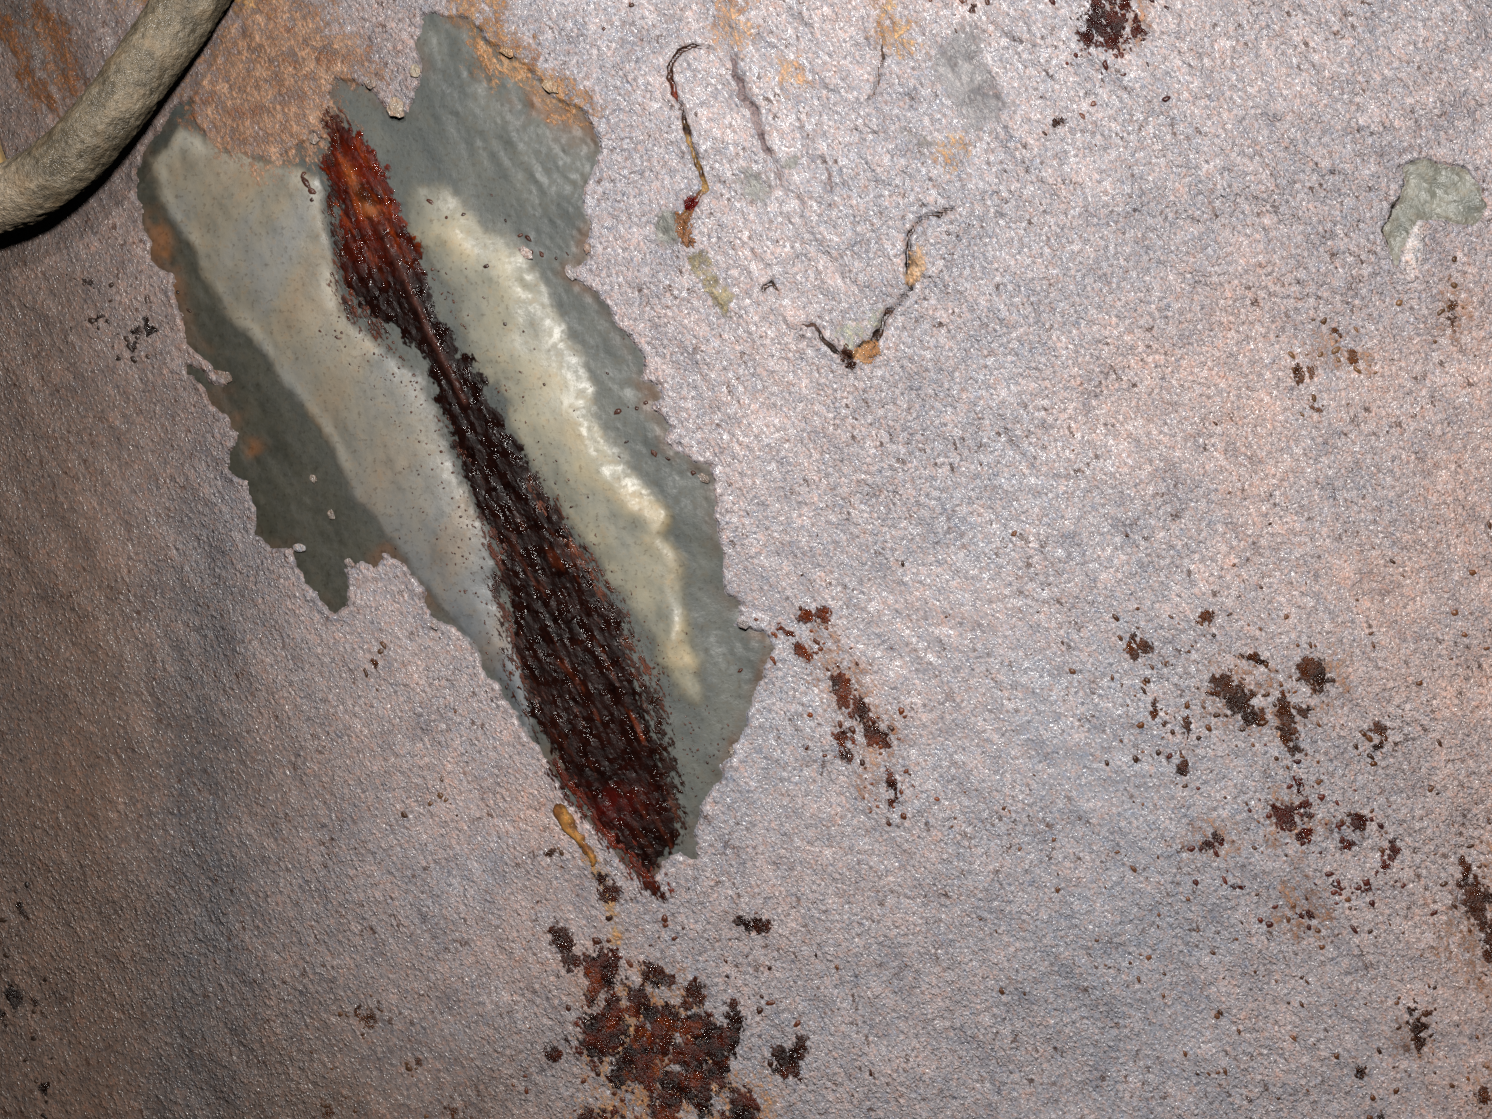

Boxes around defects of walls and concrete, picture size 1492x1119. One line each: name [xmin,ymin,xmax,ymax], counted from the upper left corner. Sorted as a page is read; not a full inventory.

crack [656,43,833,317]
crack [800,210,953,370]
crack [871,31,885,98]
corrosion [954,0,990,33]
corrosion [1042,0,1169,147]
peeling [1381,158,1487,266]
peeling [136,13,774,879]
corrosion [166,0,811,1119]
corrosion [754,601,944,827]
corrosion [1088,586,1409,984]
corrosion [1389,780,1492,1040]
corrosion [1334,983,1492,1119]